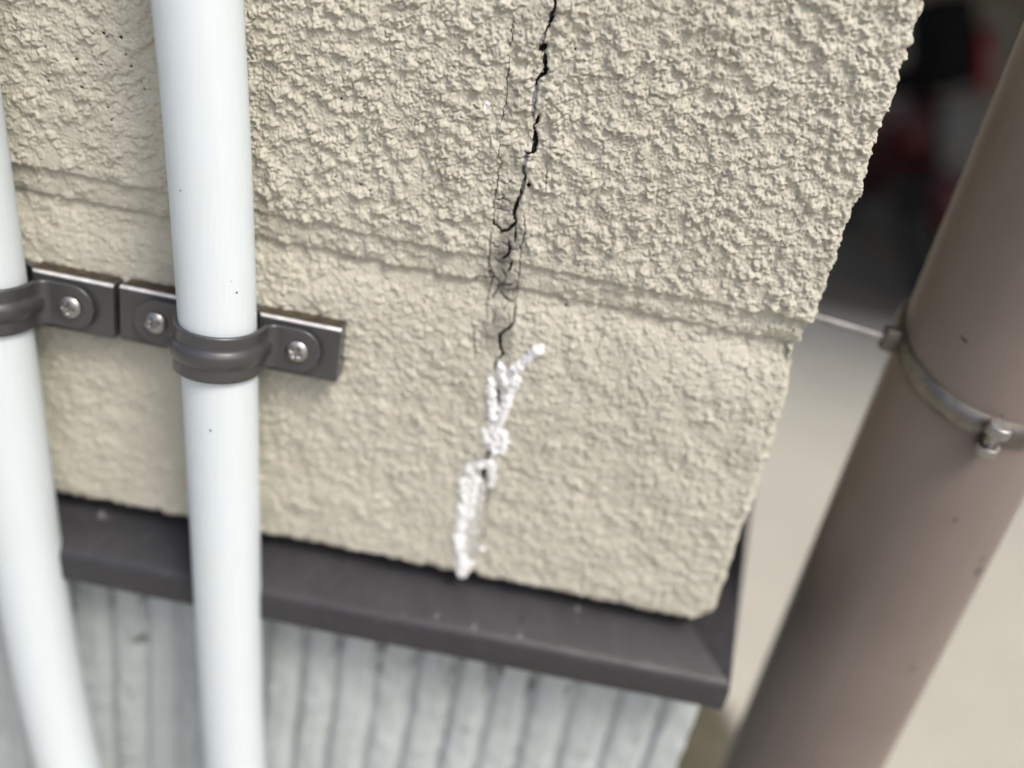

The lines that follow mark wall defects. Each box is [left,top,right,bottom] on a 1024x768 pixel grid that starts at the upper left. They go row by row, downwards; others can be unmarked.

crack [471,0,557,406]
crack [479,449,490,540]
efflorescence [453,344,545,579]